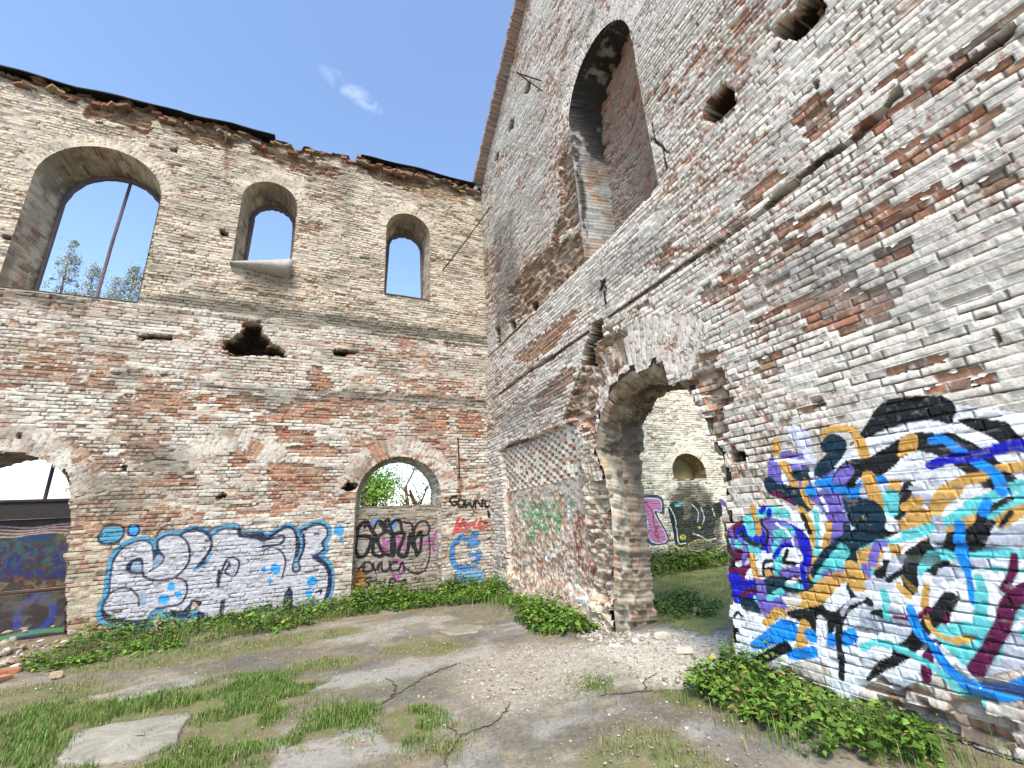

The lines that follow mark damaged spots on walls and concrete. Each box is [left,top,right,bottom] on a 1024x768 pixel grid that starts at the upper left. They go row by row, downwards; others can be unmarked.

peeling [791,2,1024,143]
spalling [223,319,288,358]
spalling [682,348,735,442]